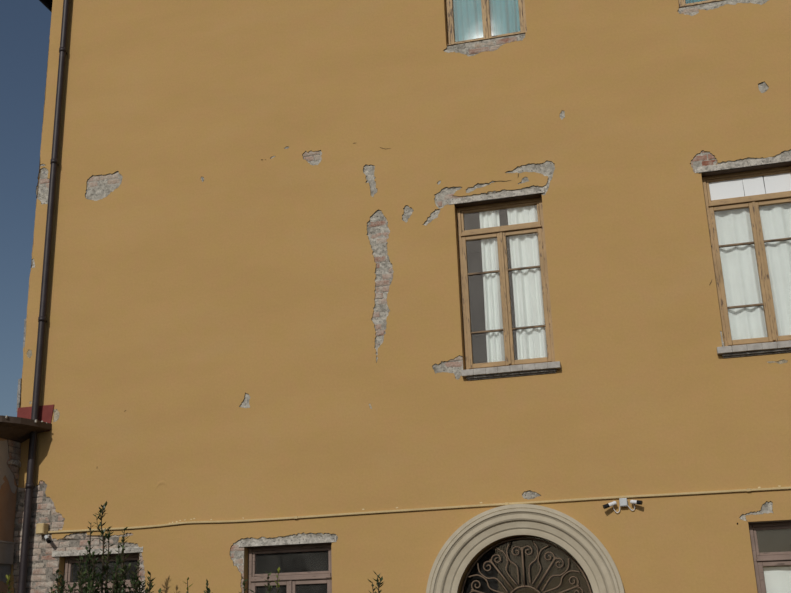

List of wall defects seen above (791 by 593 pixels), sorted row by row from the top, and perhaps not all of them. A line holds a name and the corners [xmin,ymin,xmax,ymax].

flaking render [678,0,769,16]
flaking render [443,33,525,56]
flaking render [690,149,791,174]
flaking render [36,164,50,204]
flaking render [85,171,123,201]
flaking render [363,164,377,197]
flaking render [422,160,555,226]
flaking render [367,209,394,362]
flaking render [432,355,463,380]
flaking render [0,440,145,593]
flaking render [739,501,773,521]
flaking render [230,532,338,593]